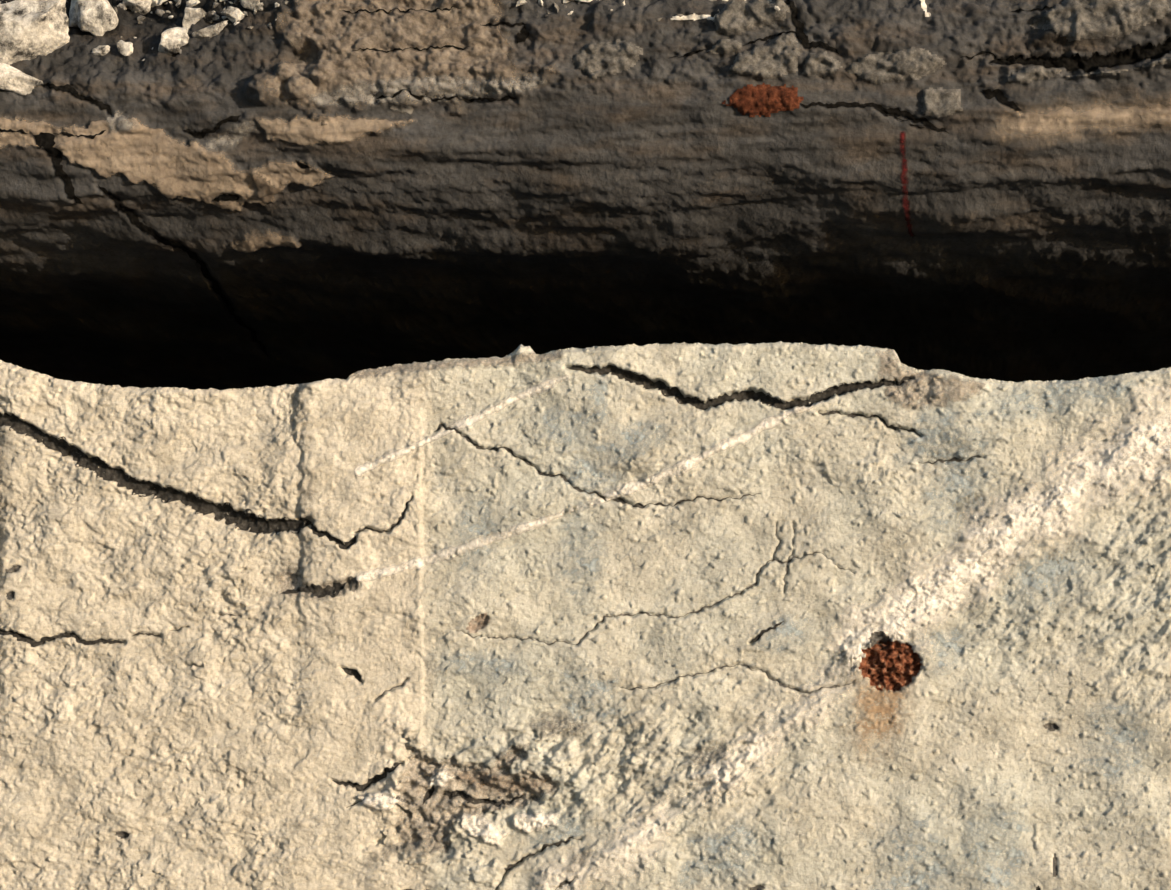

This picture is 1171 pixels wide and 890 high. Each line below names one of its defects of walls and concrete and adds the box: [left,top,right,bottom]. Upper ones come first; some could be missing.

spalling [258,0,556,146]
peeling [571,39,643,79]
rust [722,83,803,117]
crack [960,37,1171,113]
peeling [0,117,331,211]
crack [0,83,268,357]
crack [567,365,985,464]
crack [0,413,413,549]
crack [434,423,760,509]
crack [0,627,184,647]
crack [280,582,347,598]
rust [858,640,922,738]